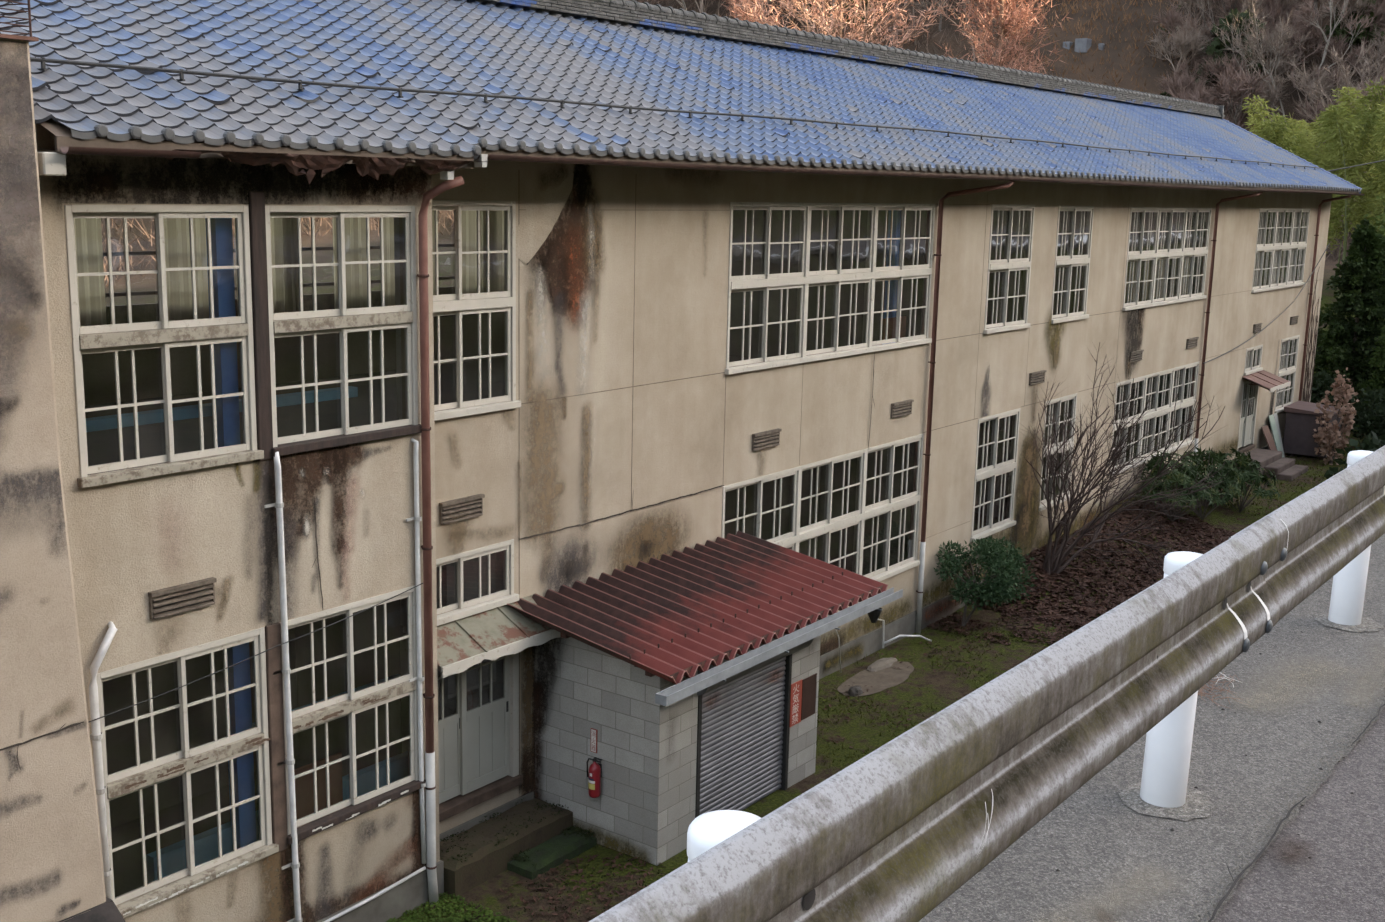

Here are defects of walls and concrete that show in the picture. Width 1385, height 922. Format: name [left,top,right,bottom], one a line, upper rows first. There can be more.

damp [347,164,432,202]
corrosion [530,164,602,392]
damp [499,291,566,578]
damp [582,406,591,528]
damp [0,469,65,541]
corrosion [825,644,863,670]
crack [0,722,84,770]